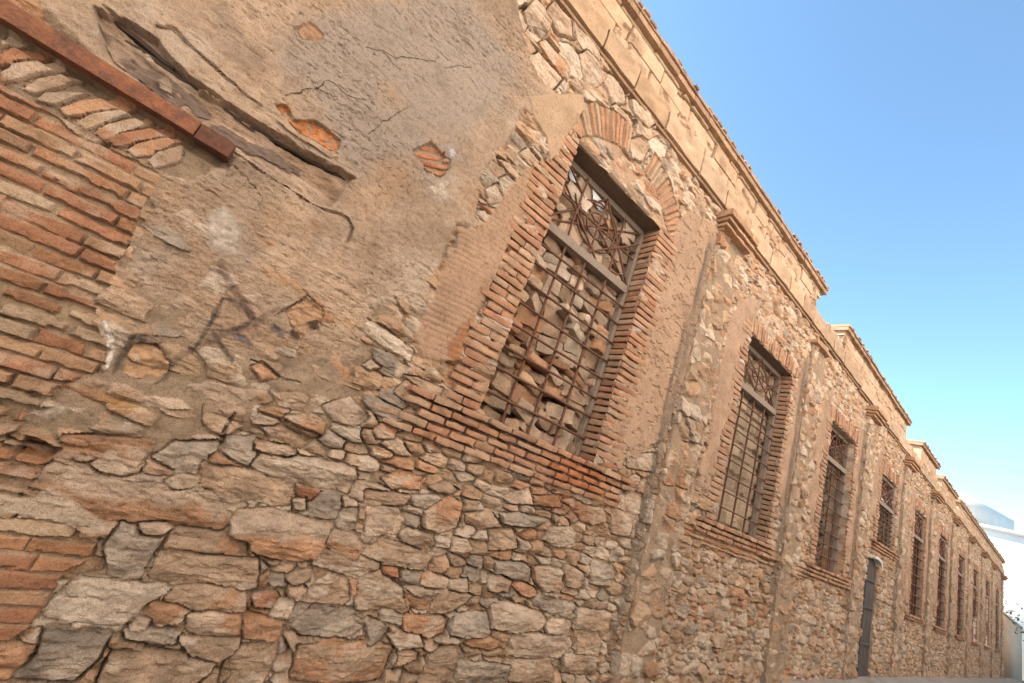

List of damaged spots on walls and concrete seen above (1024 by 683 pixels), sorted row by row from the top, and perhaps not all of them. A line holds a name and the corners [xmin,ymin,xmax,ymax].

crack [375,49,477,70]
peeling [98,24,301,176]
crack [287,80,365,100]
flaking render [276,104,340,157]
flaking render [415,142,459,200]
crack [226,155,354,242]
flaking render [286,297,323,338]
flaking render [123,343,169,379]